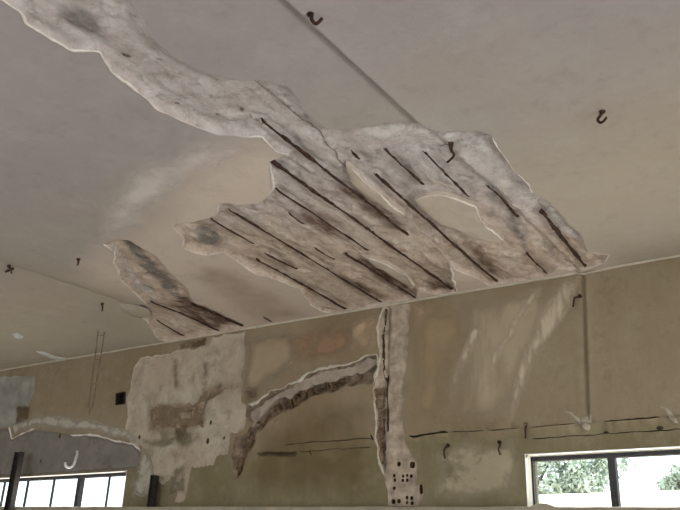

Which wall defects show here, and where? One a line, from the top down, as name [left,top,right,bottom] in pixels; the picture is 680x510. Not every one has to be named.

corrosion [172,298,231,327]
spalling [228,208,382,309]
corrosion [303,214,335,235]
flaking render [256,117,504,298]
corrosion [364,260,408,294]
leakage [462,283,574,413]
spalling [539,208,587,267]
flaking render [0,376,35,428]
flaking render [124,301,377,503]
flaking render [374,388,387,465]